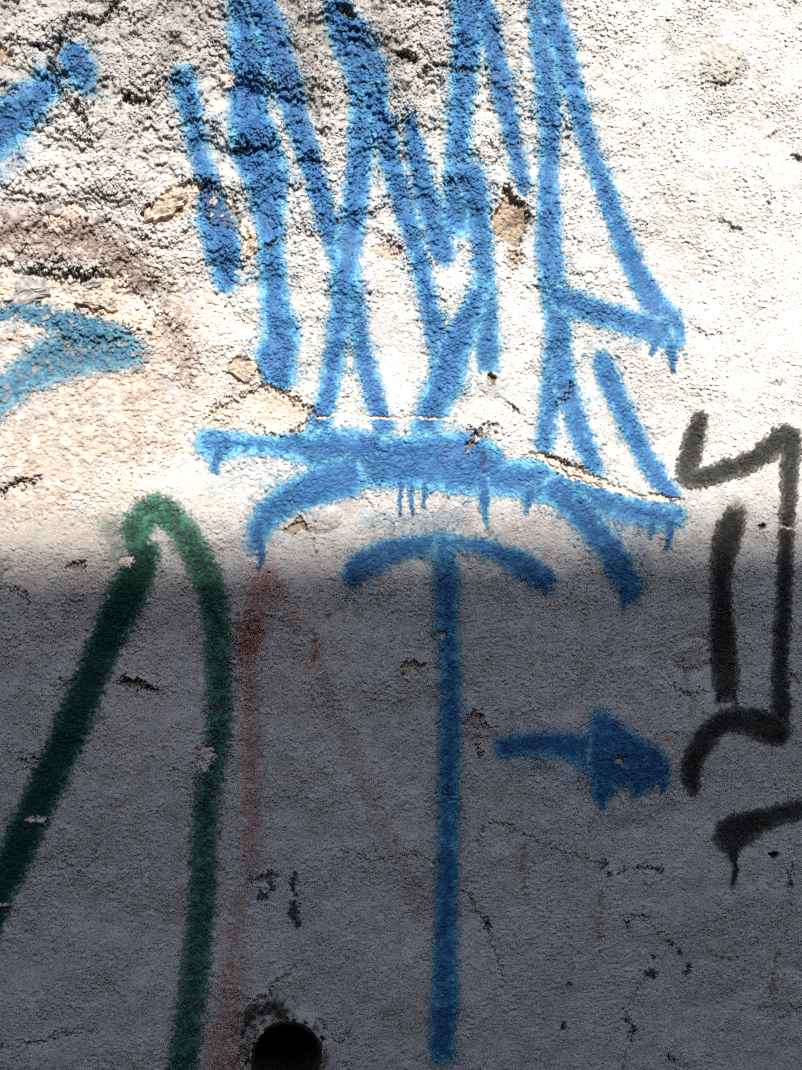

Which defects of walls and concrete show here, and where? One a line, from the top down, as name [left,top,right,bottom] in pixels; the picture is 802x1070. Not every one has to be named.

spalling [490,184,536,272]
spalling [400,658,426,677]
peeling [461,709,490,758]